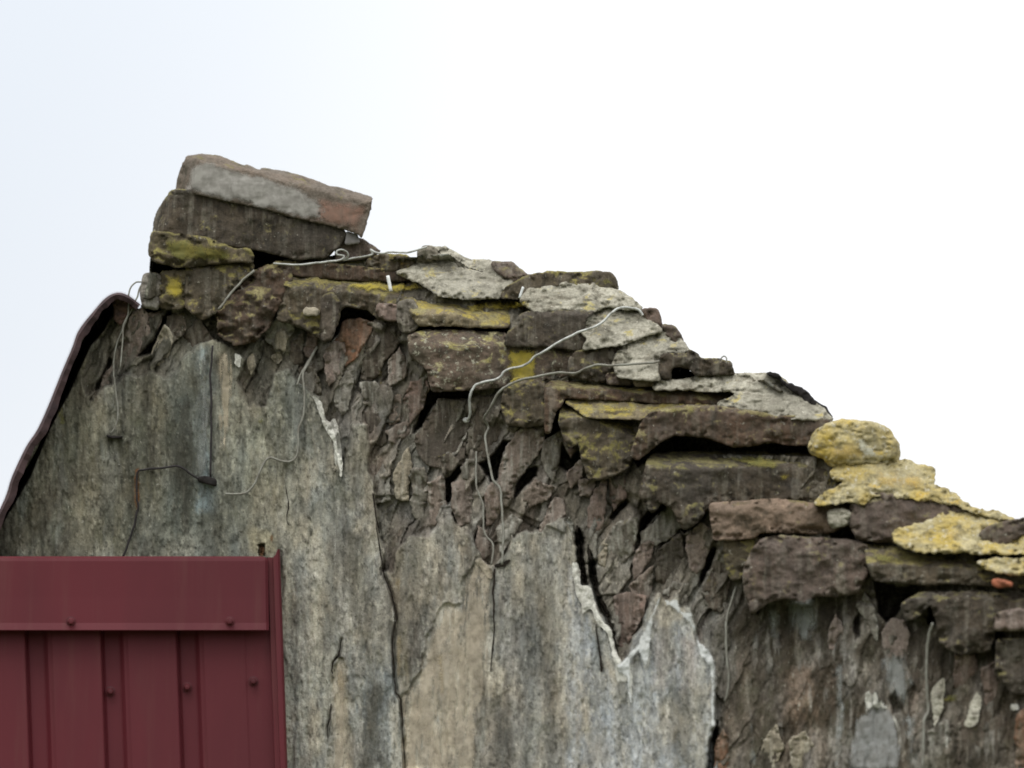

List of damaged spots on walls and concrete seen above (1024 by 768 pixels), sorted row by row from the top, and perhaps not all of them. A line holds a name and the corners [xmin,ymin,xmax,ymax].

spalling [234,353,256,374]
spalling [313,397,343,477]
crack [373,493,406,768]
peeling [475,559,492,578]
crack [490,559,510,672]
crack [576,525,618,672]
spalling [572,562,715,726]
peeling [851,691,901,768]
peeling [931,678,945,726]
peeling [964,692,982,727]